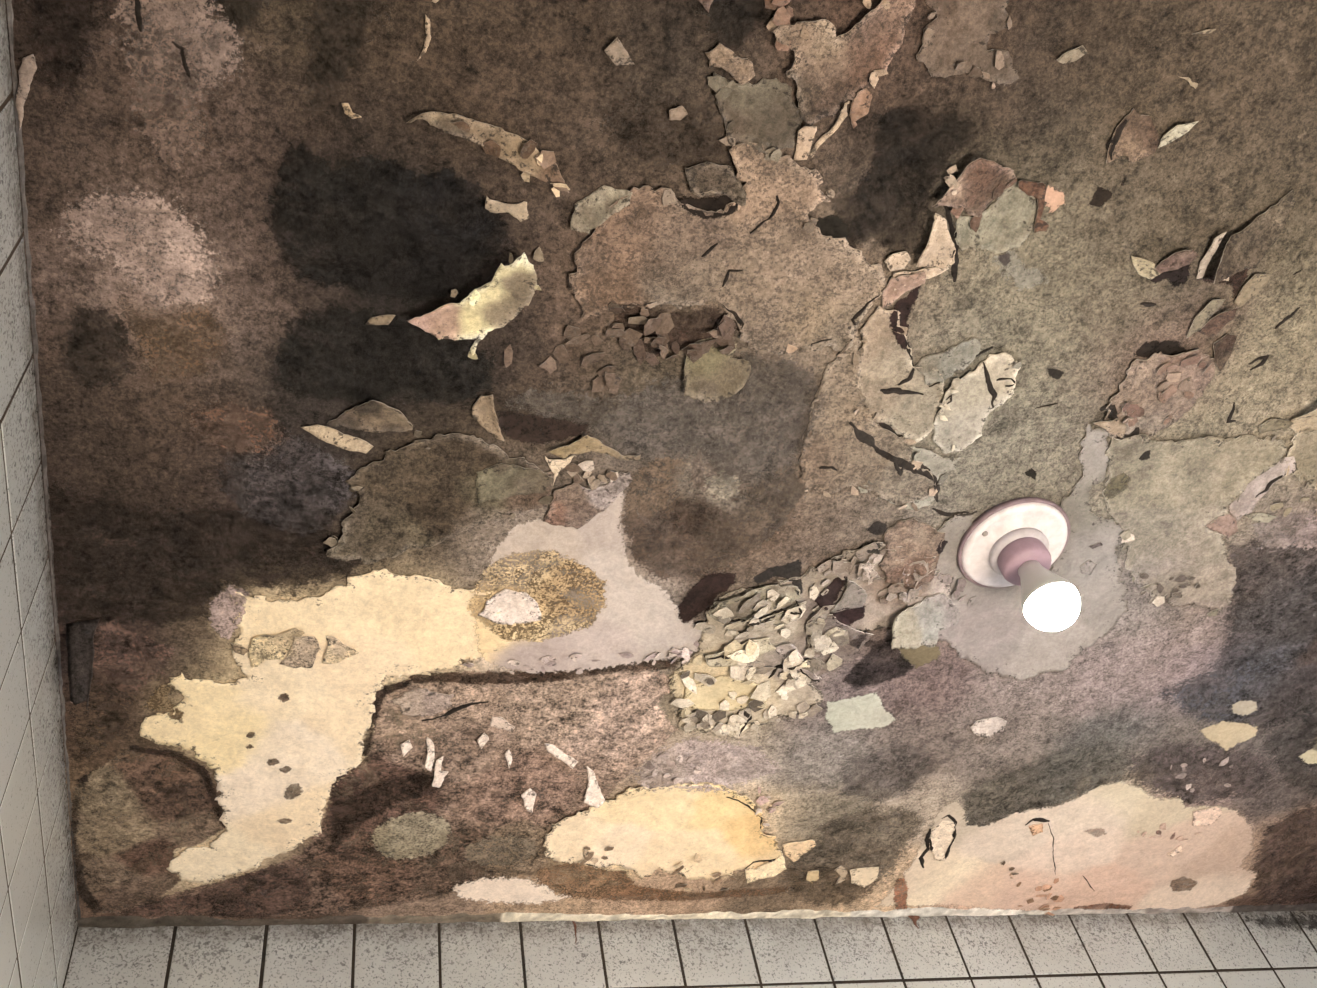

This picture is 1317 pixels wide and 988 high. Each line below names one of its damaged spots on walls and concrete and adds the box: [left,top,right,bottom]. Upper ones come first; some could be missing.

peeling [407,111,570,197]
water stain [260,135,518,411]
peeling [365,247,544,359]
peeling [539,0,1066,511]
peeling [1131,232,1226,280]
crack [1249,307,1300,371]
water stain [503,351,825,488]
crack [1226,402,1236,423]
flaking render [139,274,1317,893]
water stain [958,535,1317,935]
flaking render [453,876,571,906]
flaking render [875,781,1257,916]